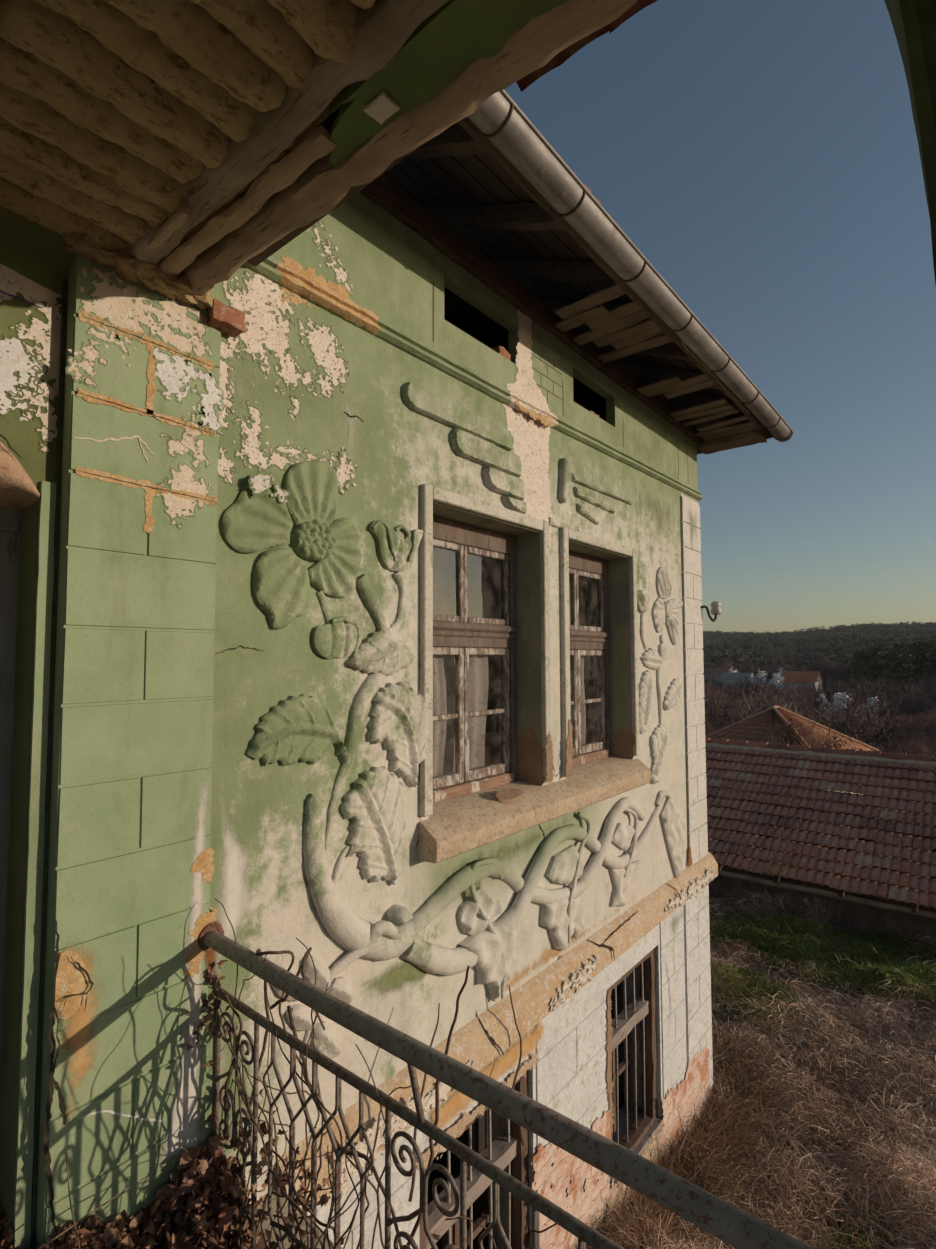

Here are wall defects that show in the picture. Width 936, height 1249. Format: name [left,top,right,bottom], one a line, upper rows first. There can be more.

peeling [0,220,383,529]
crack [0,434,23,459]
spalling [503,310,559,547]
spalling [191,848,215,884]
spalling [181,907,218,981]
crack [586,911,638,961]
crack [43,921,164,1233]
spalling [641,1090,714,1167]
spalling [589,1176,645,1239]